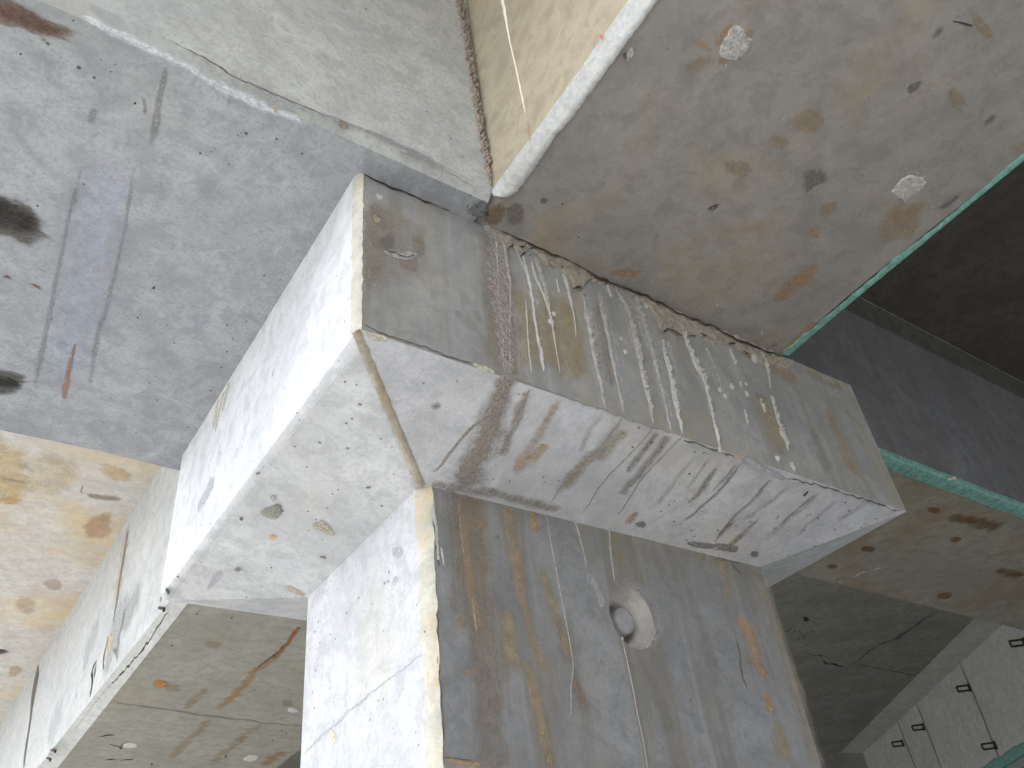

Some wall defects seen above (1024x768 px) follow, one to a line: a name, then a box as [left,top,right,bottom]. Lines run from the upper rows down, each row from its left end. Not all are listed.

spalling [717,25,753,67]
crack [173,42,476,189]
spalling [891,172,926,217]
corrosion [62,344,76,399]
water stain [486,390,529,454]
crack [74,609,420,761]
corrosion [222,627,300,706]
crack [807,612,936,676]